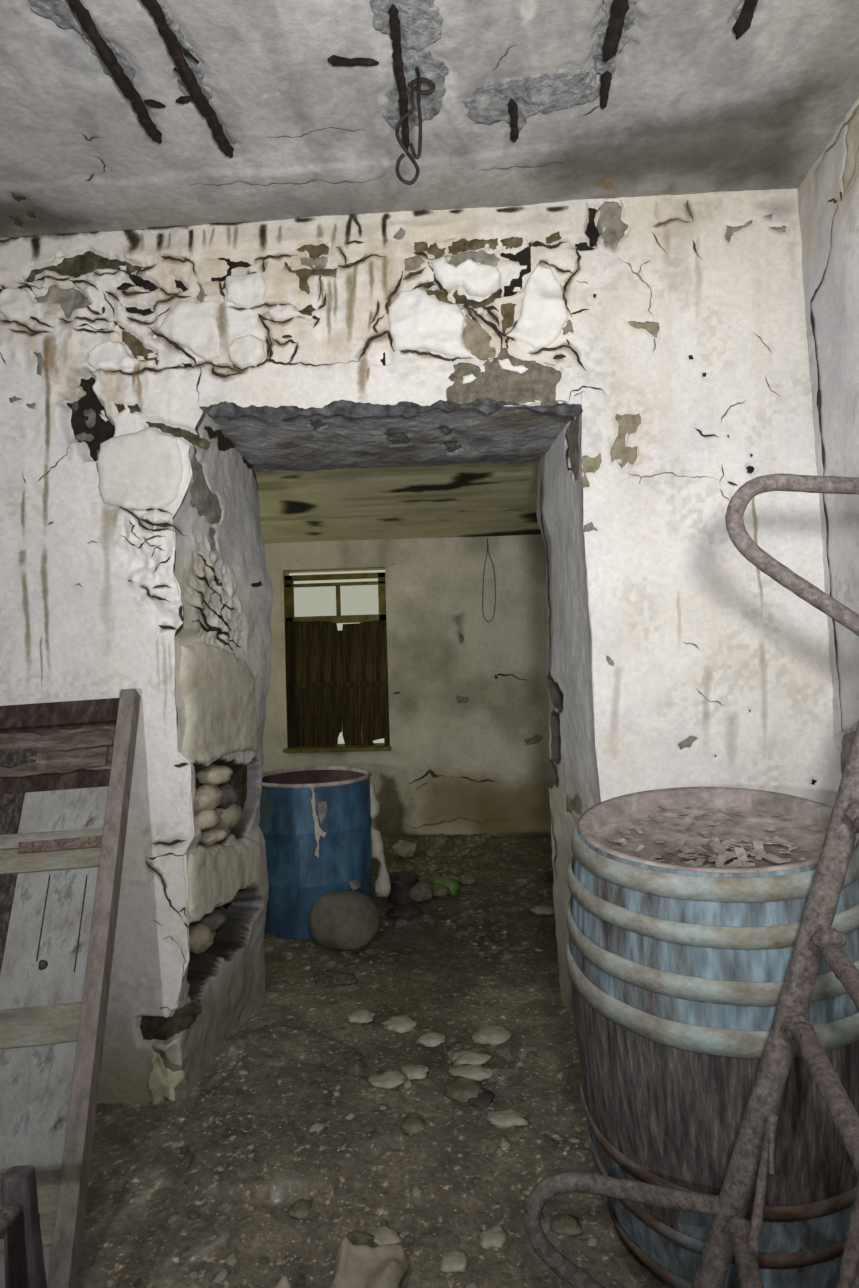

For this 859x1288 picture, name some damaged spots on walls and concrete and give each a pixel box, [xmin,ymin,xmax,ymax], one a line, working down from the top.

spalling [28,0,236,158]
spalling [328,0,449,149]
spalling [463,0,639,143]
spalling [22,251,158,318]
spalling [546,201,630,251]
spalling [61,377,141,461]
spalling [199,228,641,488]
crack [628,468,738,501]
crack [695,334,780,438]
crack [810,105,859,734]
water stain [23,556,48,672]
crack [87,506,241,655]